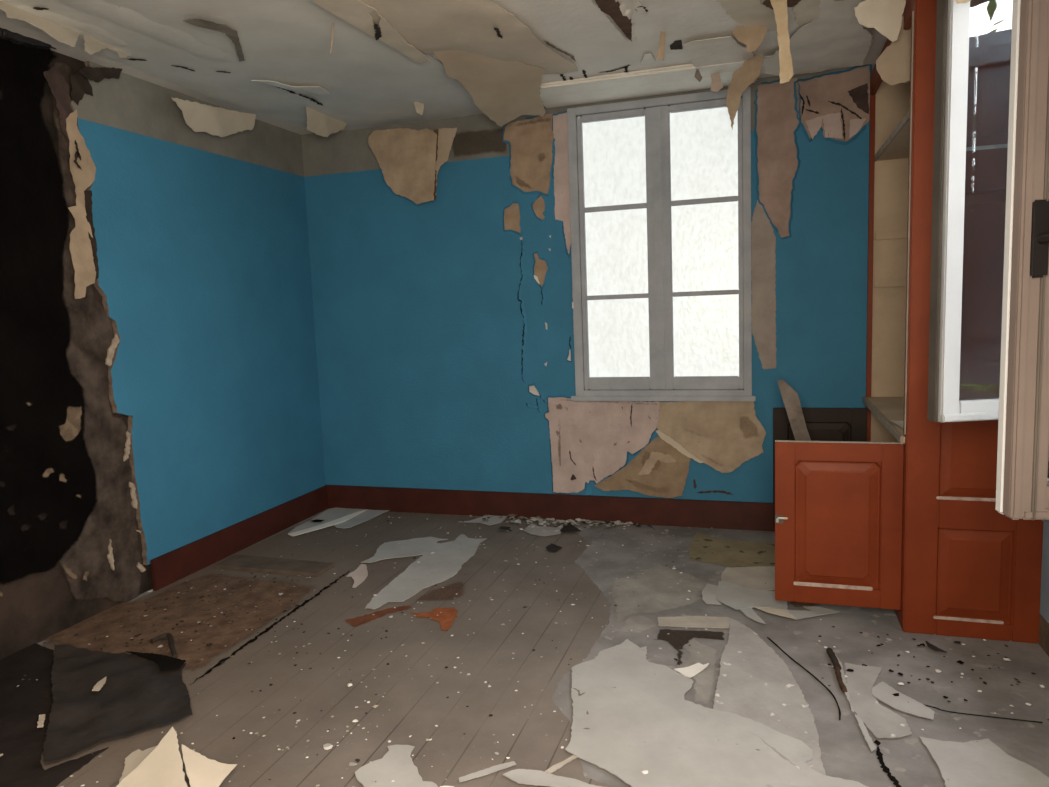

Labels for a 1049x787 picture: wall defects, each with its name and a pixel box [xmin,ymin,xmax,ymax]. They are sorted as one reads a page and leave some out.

flaking render [49,87,146,604]
peeling [502,111,571,290]
flaking render [528,384,661,495]
peeling [751,64,872,369]